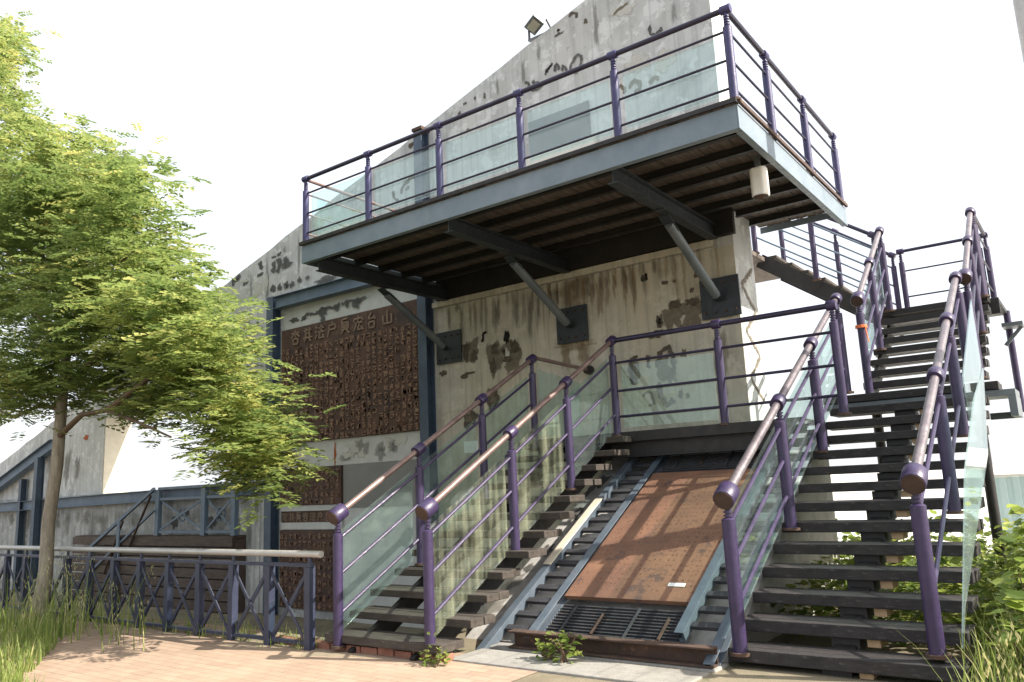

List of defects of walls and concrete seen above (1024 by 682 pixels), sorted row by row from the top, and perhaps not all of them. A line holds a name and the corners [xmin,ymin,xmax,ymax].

peeling [525,53,583,92]
peeling [232,252,336,293]
peeling [289,296,366,323]
spalling [628,296,702,408]
spalling [461,331,522,429]